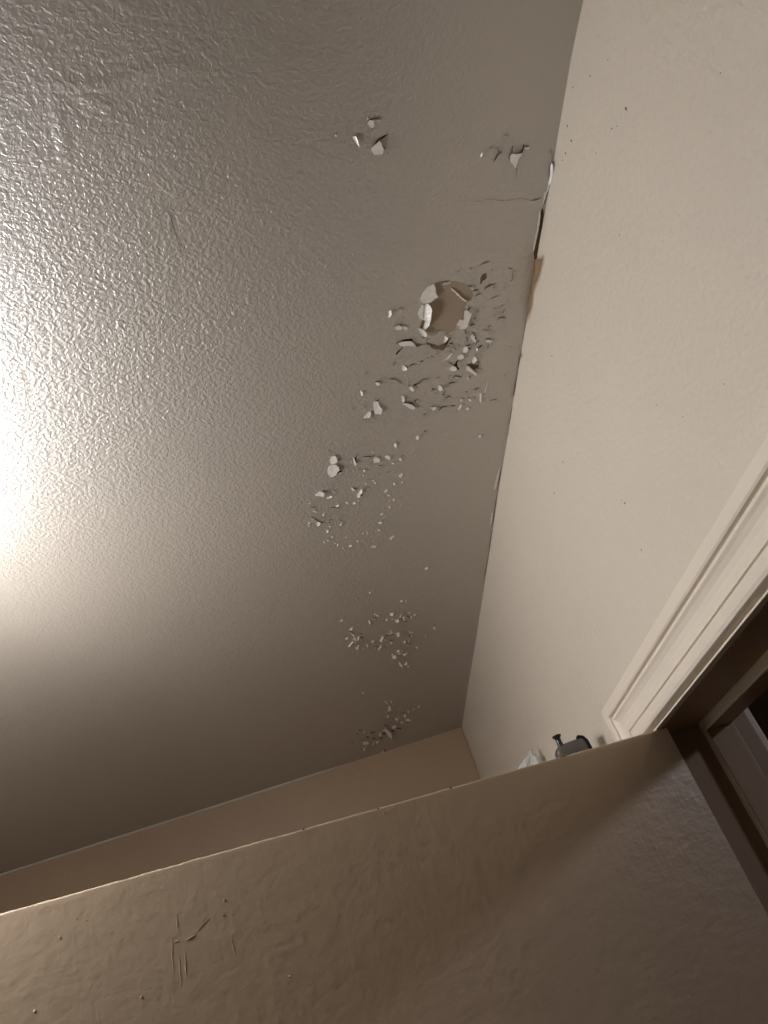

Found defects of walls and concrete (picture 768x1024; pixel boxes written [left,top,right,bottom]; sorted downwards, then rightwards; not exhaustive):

peeling [333,117,398,156]
peeling [481,135,529,176]
peeling [353,261,516,423]
peeling [308,443,416,551]
peeling [340,600,436,668]